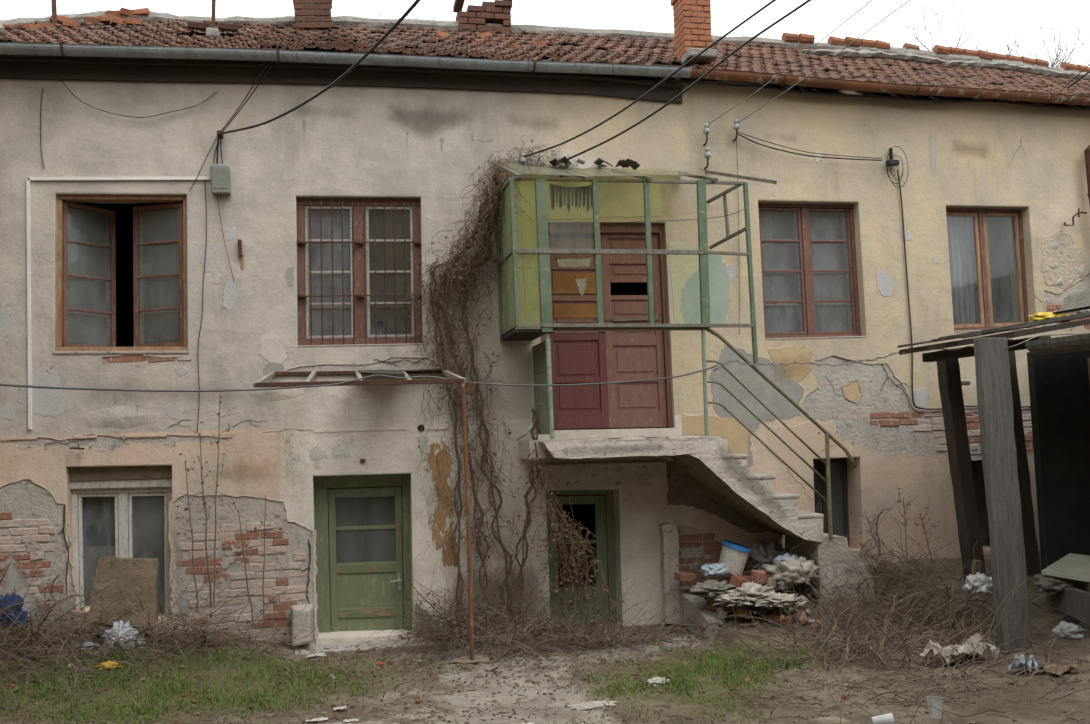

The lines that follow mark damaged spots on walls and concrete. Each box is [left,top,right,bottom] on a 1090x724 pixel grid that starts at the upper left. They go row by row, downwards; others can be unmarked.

spalling [1042,254,1090,332]
peeling [418,435,438,529]
spalling [681,344,948,500]
crack [825,355,911,410]
spalling [965,411,982,461]
spalling [1021,407,1034,455]
spalling [0,478,77,630]
spalling [168,493,319,646]